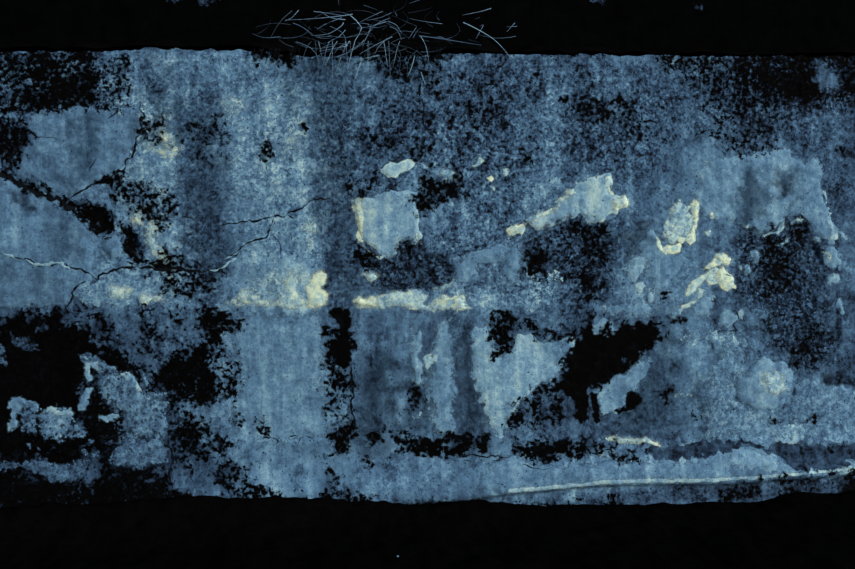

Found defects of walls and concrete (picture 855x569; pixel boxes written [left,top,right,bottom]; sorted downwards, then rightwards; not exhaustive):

crack [0,87,145,211]
crack [0,197,331,309]
spalling [343,142,687,338]
damp [763,218,803,246]
damp [0,170,760,508]
peeling [406,318,459,438]
peeling [470,148,855,495]